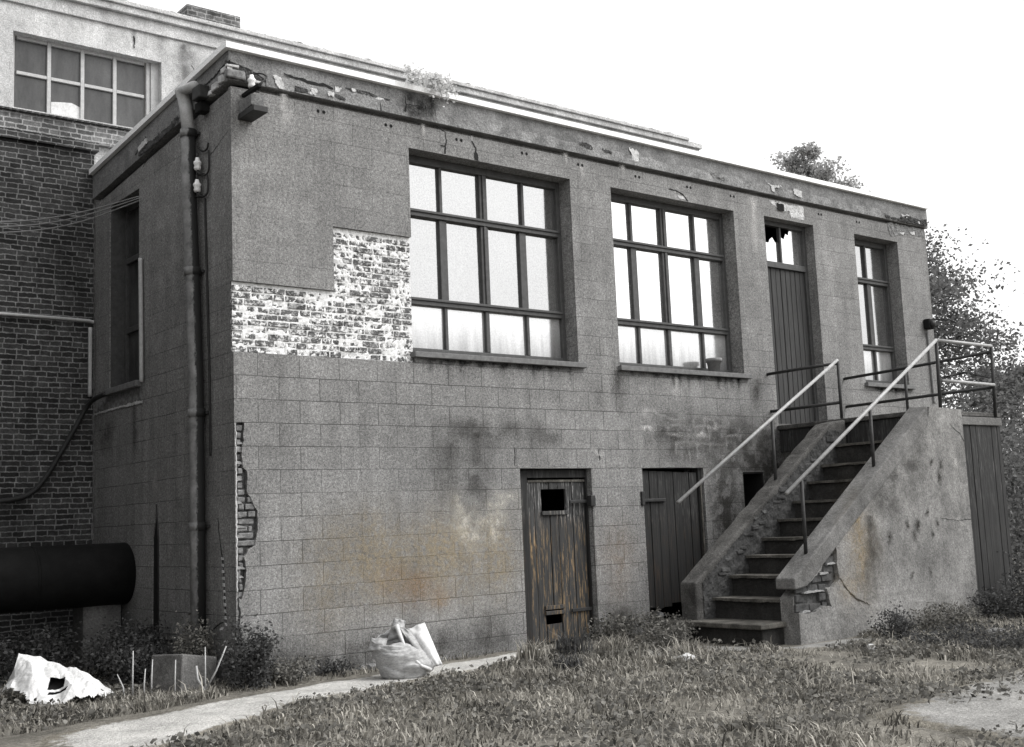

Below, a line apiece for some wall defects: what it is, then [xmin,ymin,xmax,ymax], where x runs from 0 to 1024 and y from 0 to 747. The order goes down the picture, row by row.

spalling [204,59,390,101]
spalling [769,183,804,220]
spalling [885,214,928,238]
peeling [230,228,413,362]
spalling [235,423,256,599]
spalling [703,430,844,619]